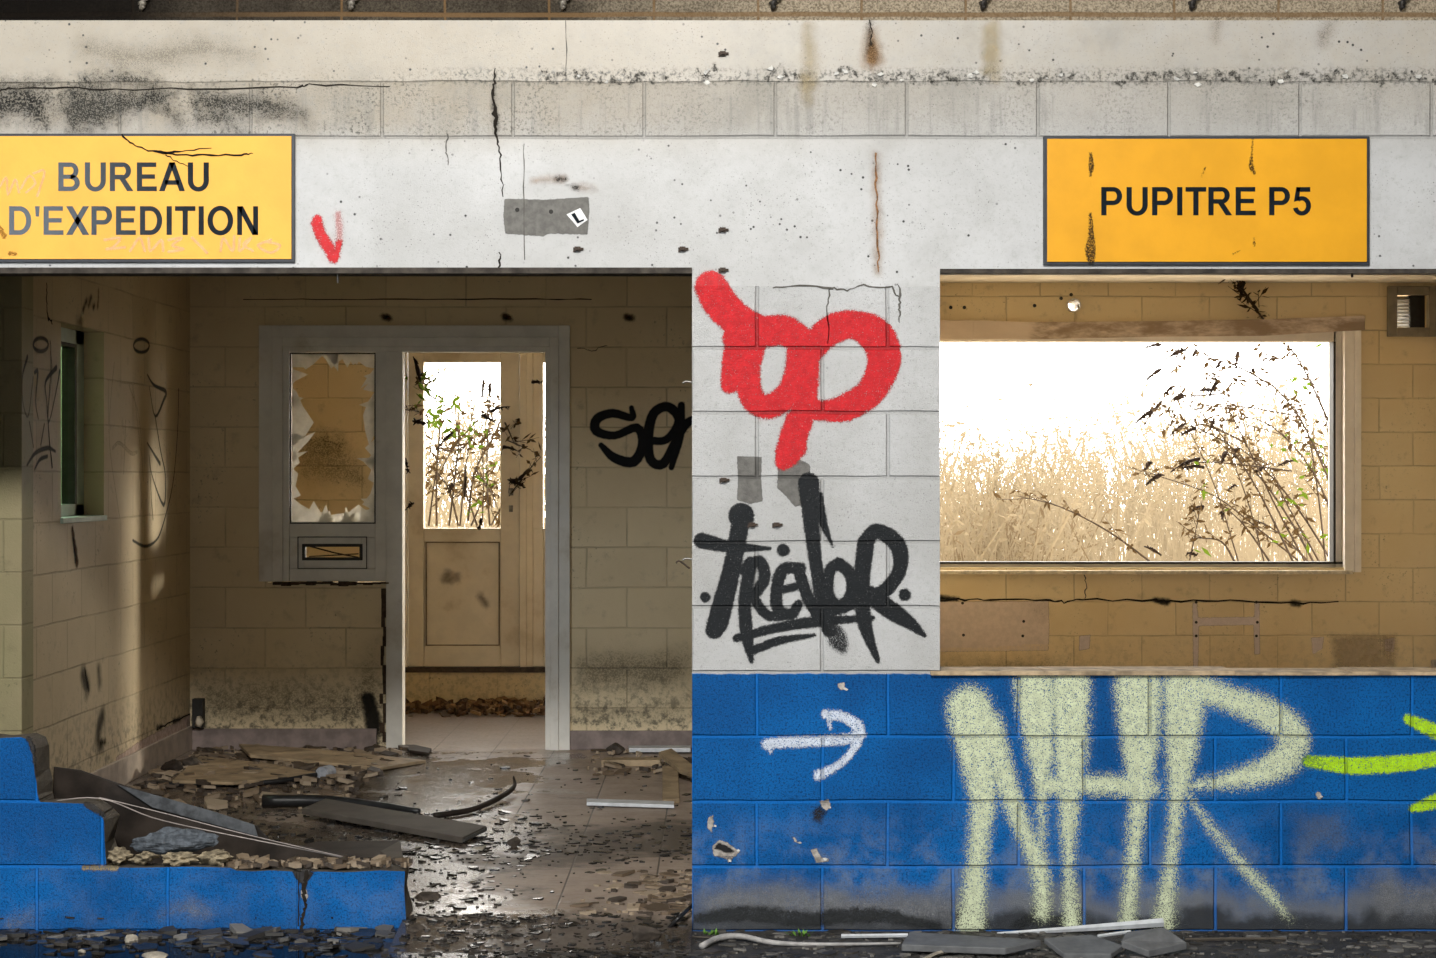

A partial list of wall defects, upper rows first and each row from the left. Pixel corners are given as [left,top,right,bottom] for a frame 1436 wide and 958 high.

corrosion [866,20,878,64]
water stain [0,72,306,132]
crack [243,68,592,300]
crack [940,575,1339,607]
water stain [361,693,381,739]
peeling [813,799,831,822]
spalling [707,815,740,862]
peeling [793,838,829,863]
crack [293,870,315,929]